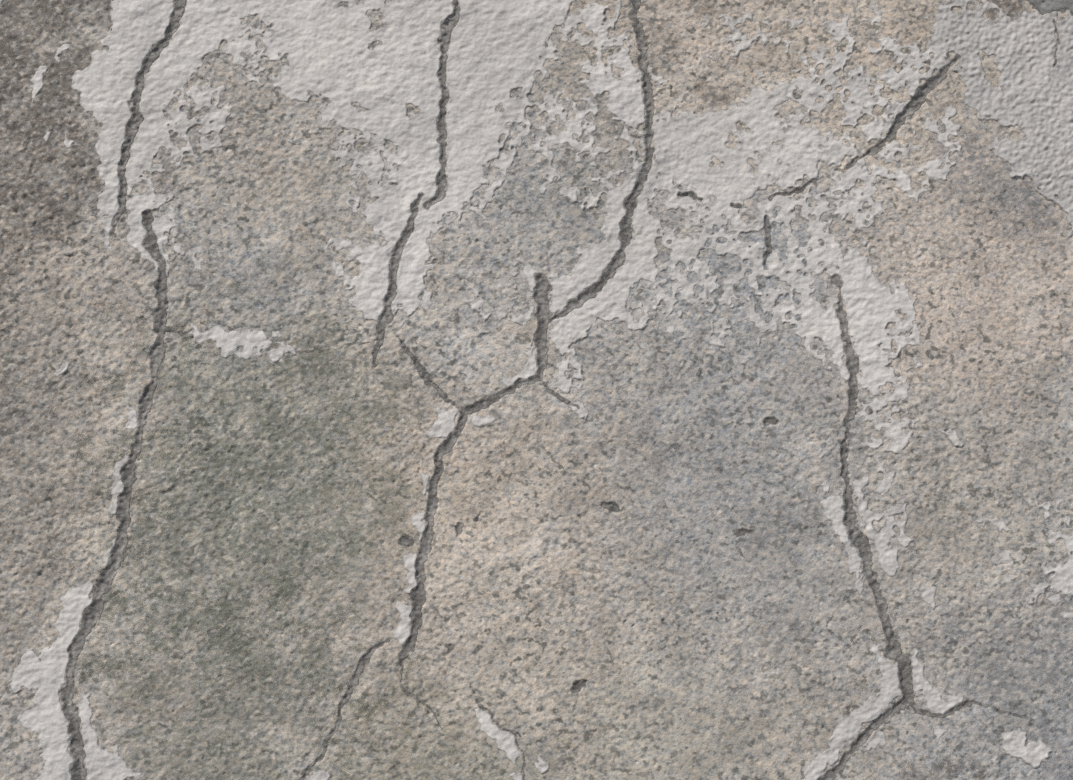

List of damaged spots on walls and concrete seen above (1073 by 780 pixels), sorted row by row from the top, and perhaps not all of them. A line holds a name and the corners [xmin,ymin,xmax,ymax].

crack [763,54,960,261]
crack [60,0,193,780]
crack [299,0,671,780]
peeling [71,0,1073,593]
peeling [10,582,145,780]
peeling [393,512,426,646]
crack [819,276,1032,780]
peeling [1002,728,1052,768]
peeling [1026,497,1073,619]